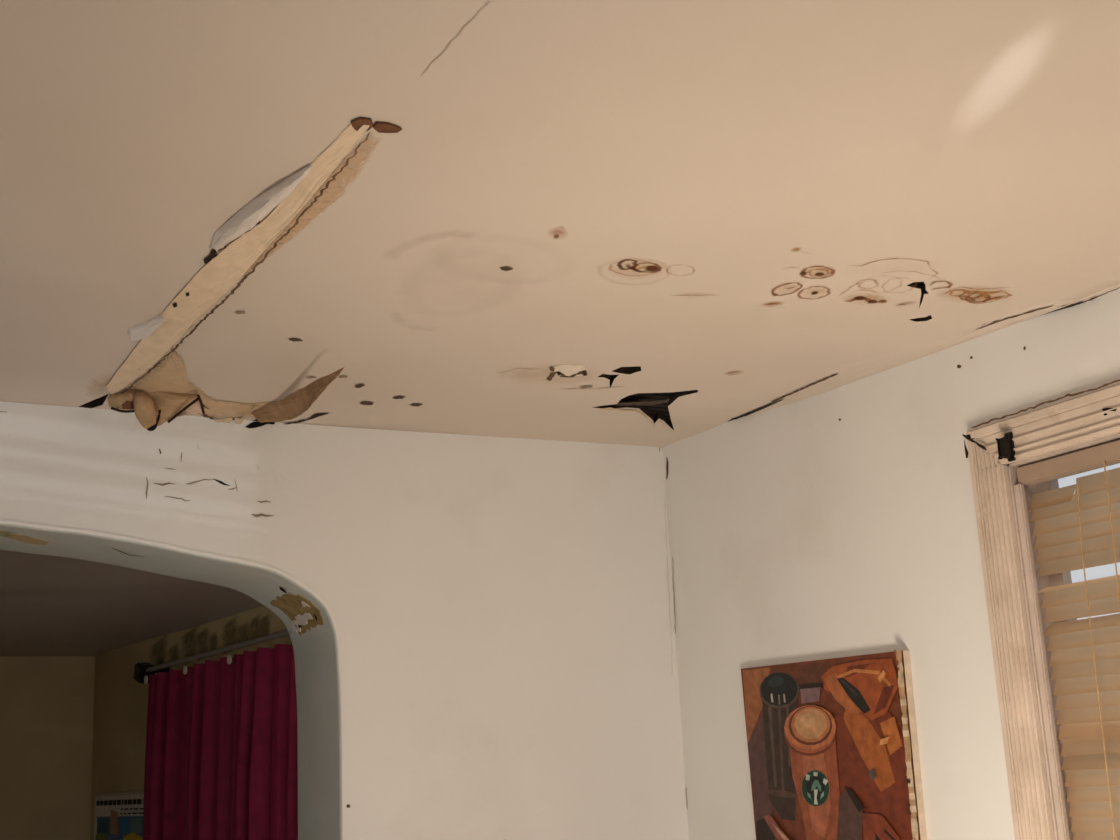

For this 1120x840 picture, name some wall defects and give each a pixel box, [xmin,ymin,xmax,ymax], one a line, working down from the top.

peeling [210,164,312,251]
water stain [618,259,661,273]
water stain [768,266,834,305]
water stain [933,281,1012,304]
peeling [134,352,276,424]
peeling [546,364,593,389]
peeling [270,592,324,636]